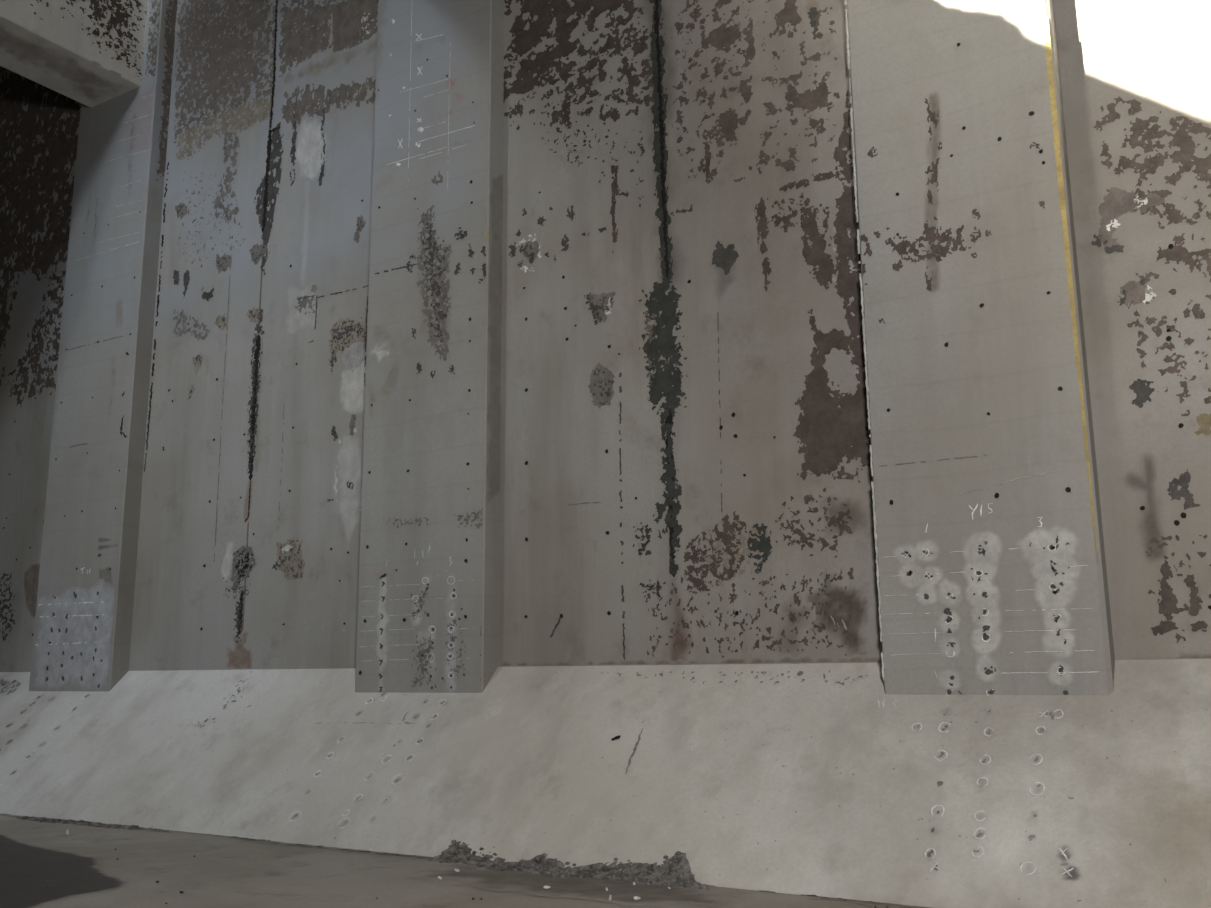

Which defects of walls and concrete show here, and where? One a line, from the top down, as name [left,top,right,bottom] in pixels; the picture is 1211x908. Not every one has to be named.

crack [261,0,281,232]
damp [174,35,377,343]
damp [633,0,691,415]
damp [921,89,947,296]
damp [0,562,40,642]
damp [327,321,404,553]
damp [633,519,656,555]
damp [813,491,875,545]
damp [1119,449,1172,567]